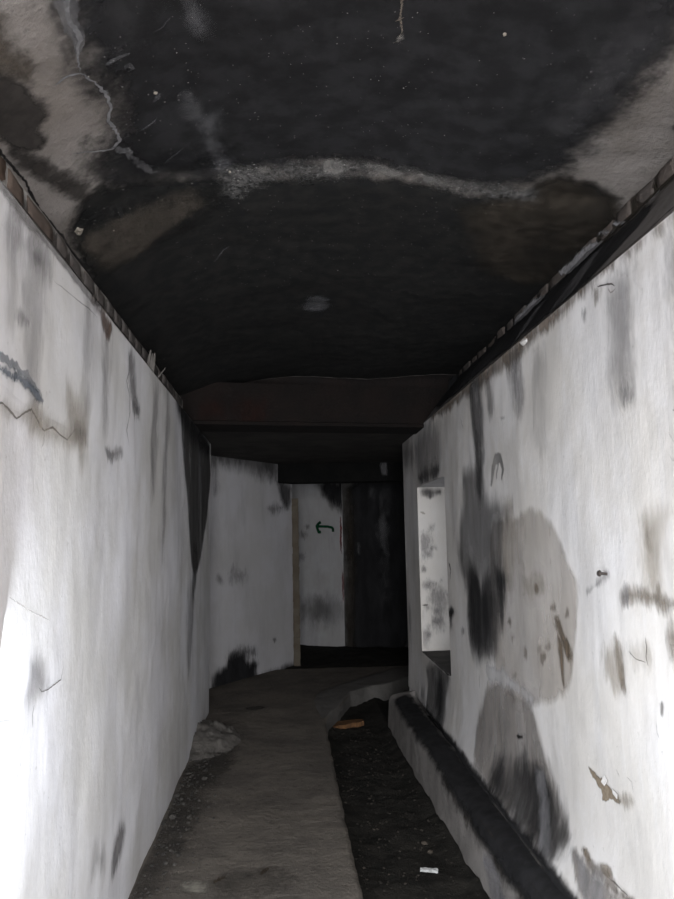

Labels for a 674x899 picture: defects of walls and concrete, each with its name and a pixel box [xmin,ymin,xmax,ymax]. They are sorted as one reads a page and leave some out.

leakage [0,16,91,200]
leakage [56,0,233,267]
crack [0,149,101,291]
crack [0,402,74,440]
leakage [177,403,210,455]
leakage [616,642,625,689]
leakage [475,682,568,864]
leakage [572,851,617,899]